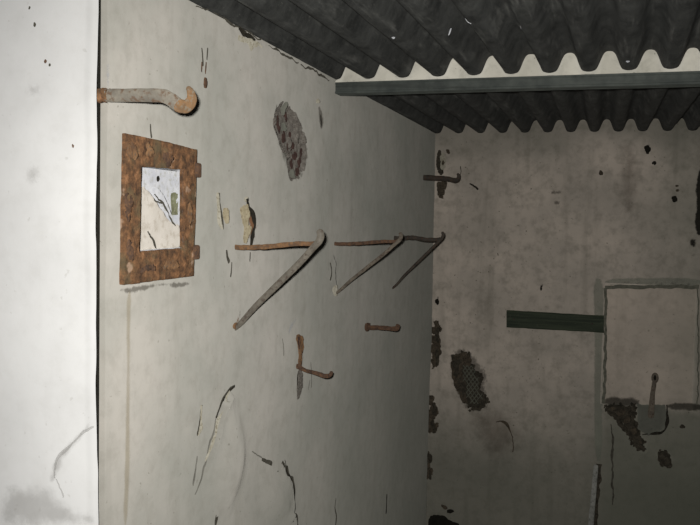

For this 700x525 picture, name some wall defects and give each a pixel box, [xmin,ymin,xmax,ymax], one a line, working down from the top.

spalling [273,101,307,181]
spalling [436,149,450,199]
peeling [216,192,256,260]
spalling [431,320,442,369]
spalling [451,350,490,412]
crack [192,385,235,494]
crack [252,451,298,525]
spalling [428,395,439,433]
spalling [604,404,647,452]
spalling [658,449,672,468]